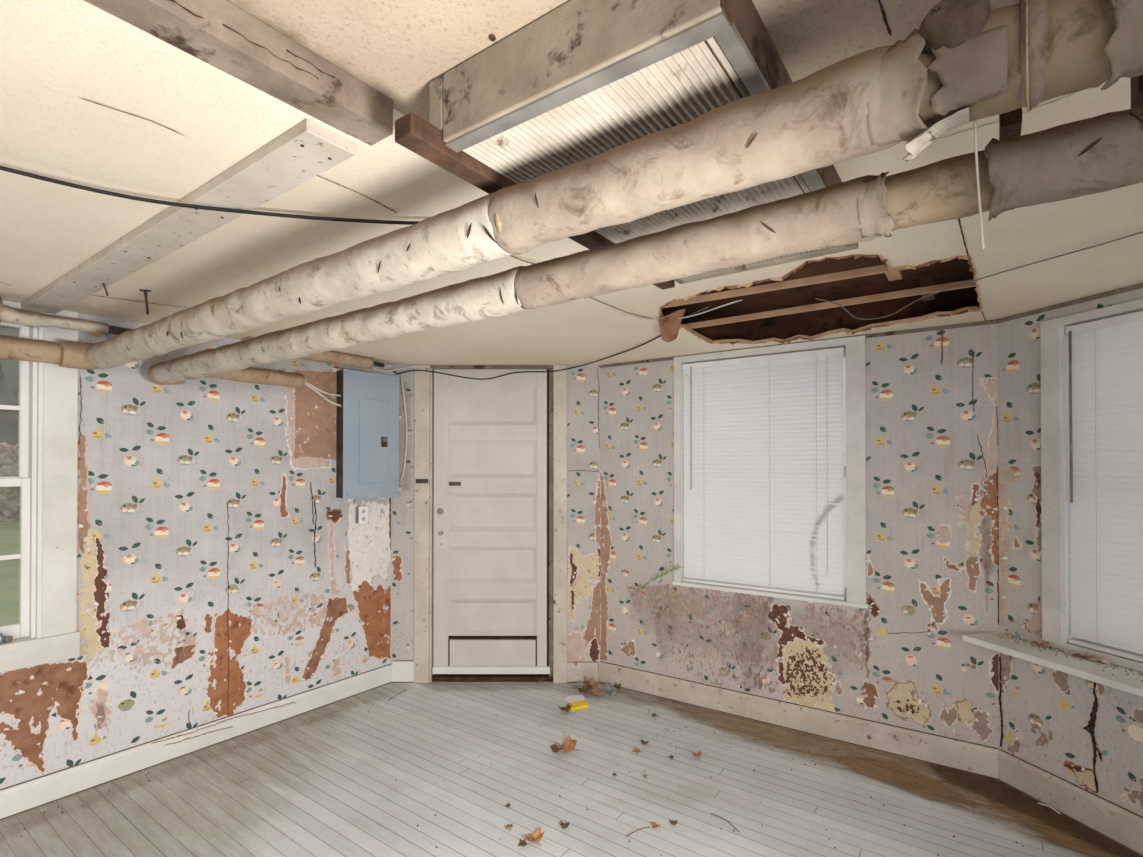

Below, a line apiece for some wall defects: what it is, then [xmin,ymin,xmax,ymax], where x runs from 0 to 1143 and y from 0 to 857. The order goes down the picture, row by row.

crack [878,0,892,36]
spalling [658,254,983,345]
spalling [326,509,343,523]
peeling [569,552,578,610]
peeling [86,601,138,663]
flaking render [768,603,853,698]
flaking render [893,699,928,715]
crack [997,656,1005,747]
crack [1083,682,1102,792]